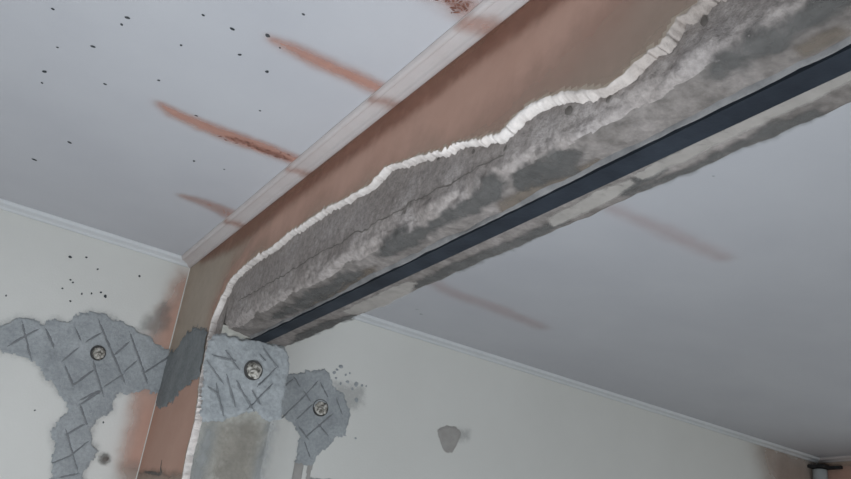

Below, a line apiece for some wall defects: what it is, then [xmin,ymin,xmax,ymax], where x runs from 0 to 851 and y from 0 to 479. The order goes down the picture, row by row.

rust [162,106,296,162]
crack [239,154,504,301]
rust [202,0,556,259]
water stain [213,0,686,314]
flaking render [182,0,851,479]